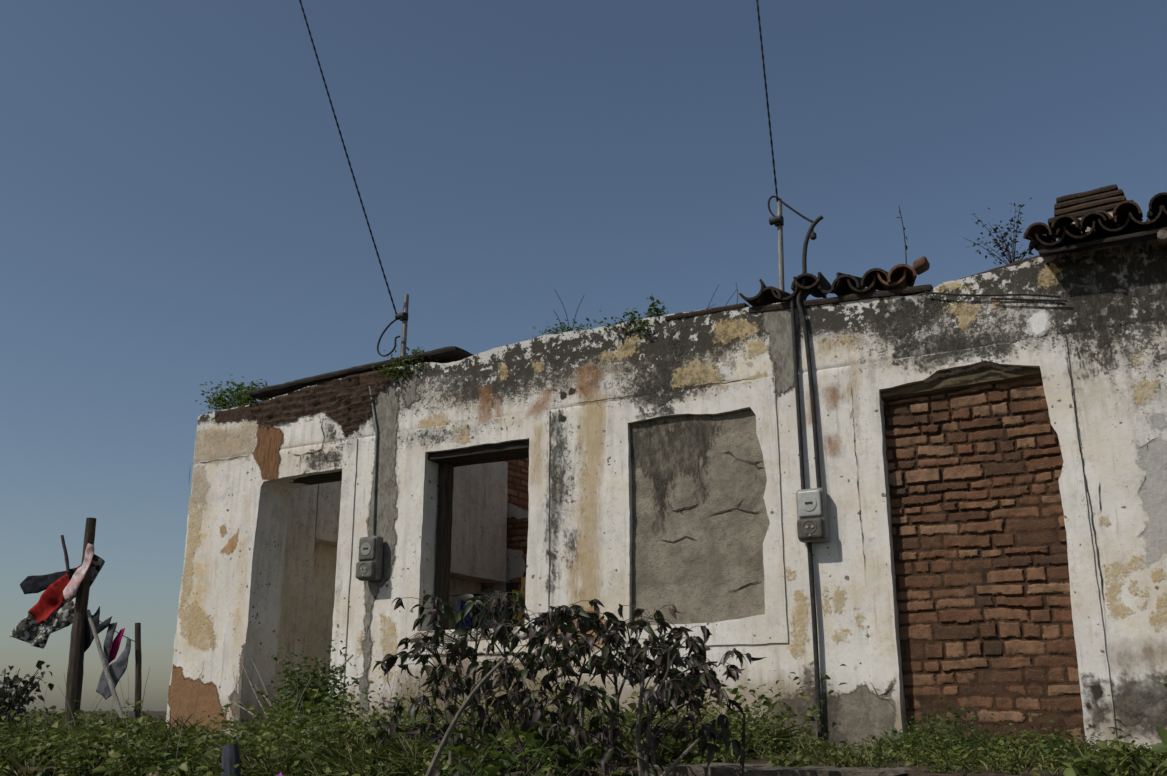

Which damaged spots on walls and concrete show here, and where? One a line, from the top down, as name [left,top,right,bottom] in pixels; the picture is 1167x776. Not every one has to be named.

flaking render [670,357,767,389]
flaking render [713,318,767,358]
leakage [869,291,1018,374]
mould [1023,242,1167,379]
flaking render [178,367,421,656]
leakage [535,401,603,613]
crack [1065,350,1106,631]
peeling [1103,355,1167,632]
flaking render [167,644,245,732]
leakage [1081,673,1167,739]